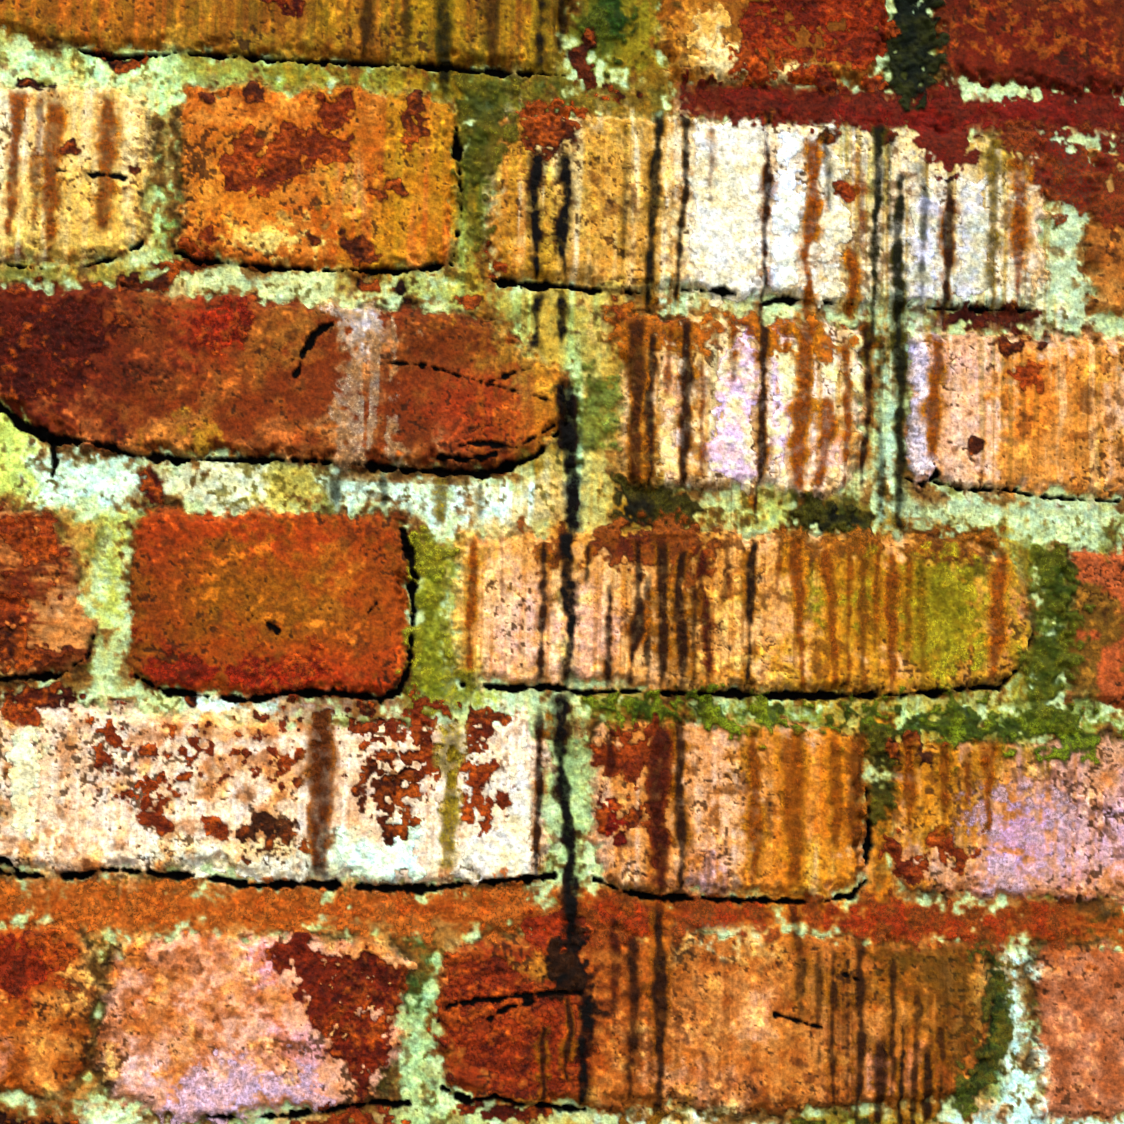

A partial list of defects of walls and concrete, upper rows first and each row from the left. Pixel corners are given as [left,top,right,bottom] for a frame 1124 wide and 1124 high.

corrosion [4,91,68,243]
corrosion [93,96,122,228]
crack [0,361,567,480]
crack [292,322,334,378]
corrosion [603,295,866,365]
corrosion [517,508,722,596]
leakage [601,540,759,685]
leakage [303,710,338,876]
leakage [435,721,465,868]
leakage [531,380,672,1111]
leakage [644,720,693,889]
crack [437,990,582,1023]